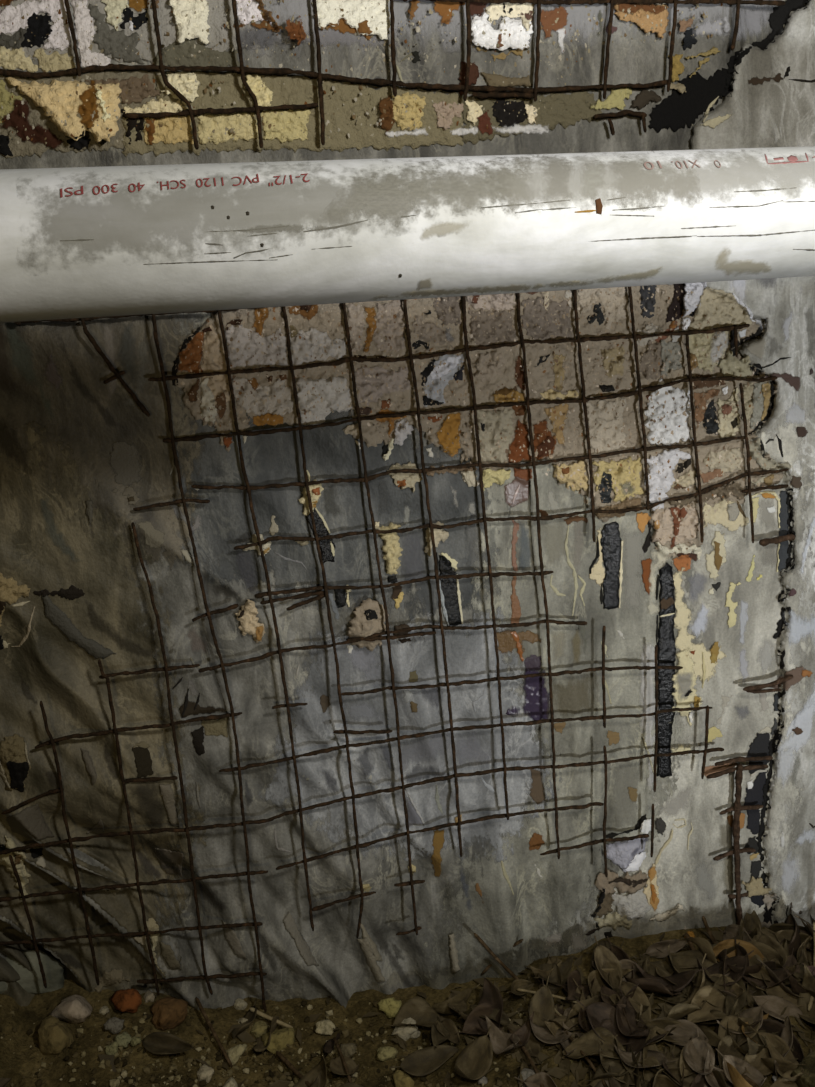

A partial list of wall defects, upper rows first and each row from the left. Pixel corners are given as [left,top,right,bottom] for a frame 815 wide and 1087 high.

flaking render [312,0,390,40]
flaking render [471,3,533,51]
flaking render [0,0,273,150]
spalling [648,28,743,133]
spalling [639,282,752,376]
rust [493,356,557,507]
rust [641,558,652,594]
rust [669,507,697,572]
rust [714,541,723,570]
rust [704,755,773,925]
spalling [741,675,793,928]
rust [609,867,660,911]